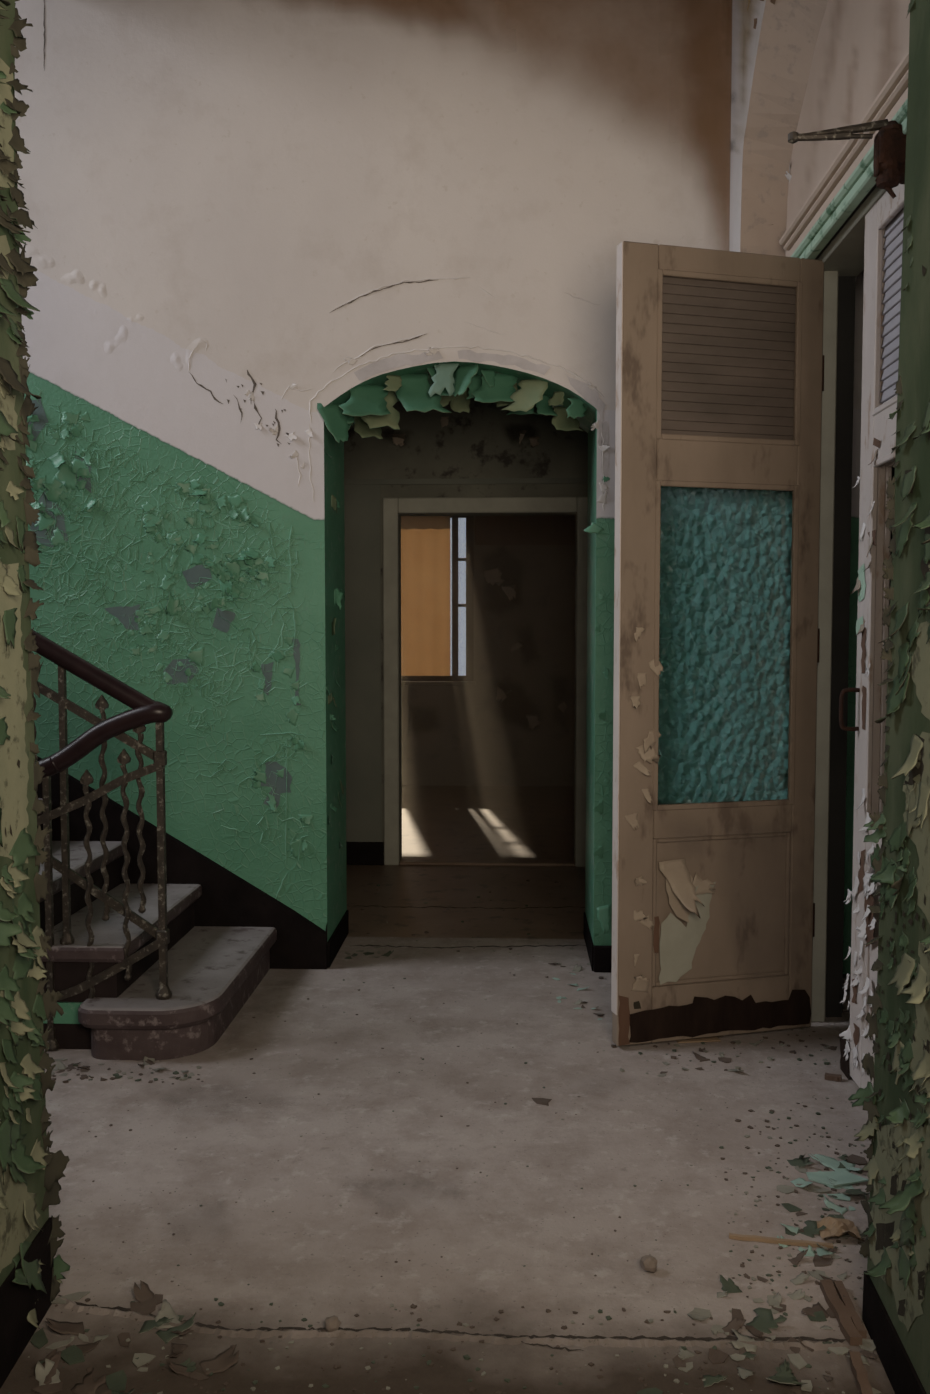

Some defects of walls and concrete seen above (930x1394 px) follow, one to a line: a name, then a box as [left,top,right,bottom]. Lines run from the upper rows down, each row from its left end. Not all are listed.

peeling [0,0,196,1386]
crack [330,277,505,336]
peeling [286,346,611,534]
peeling [820,375,930,1331]